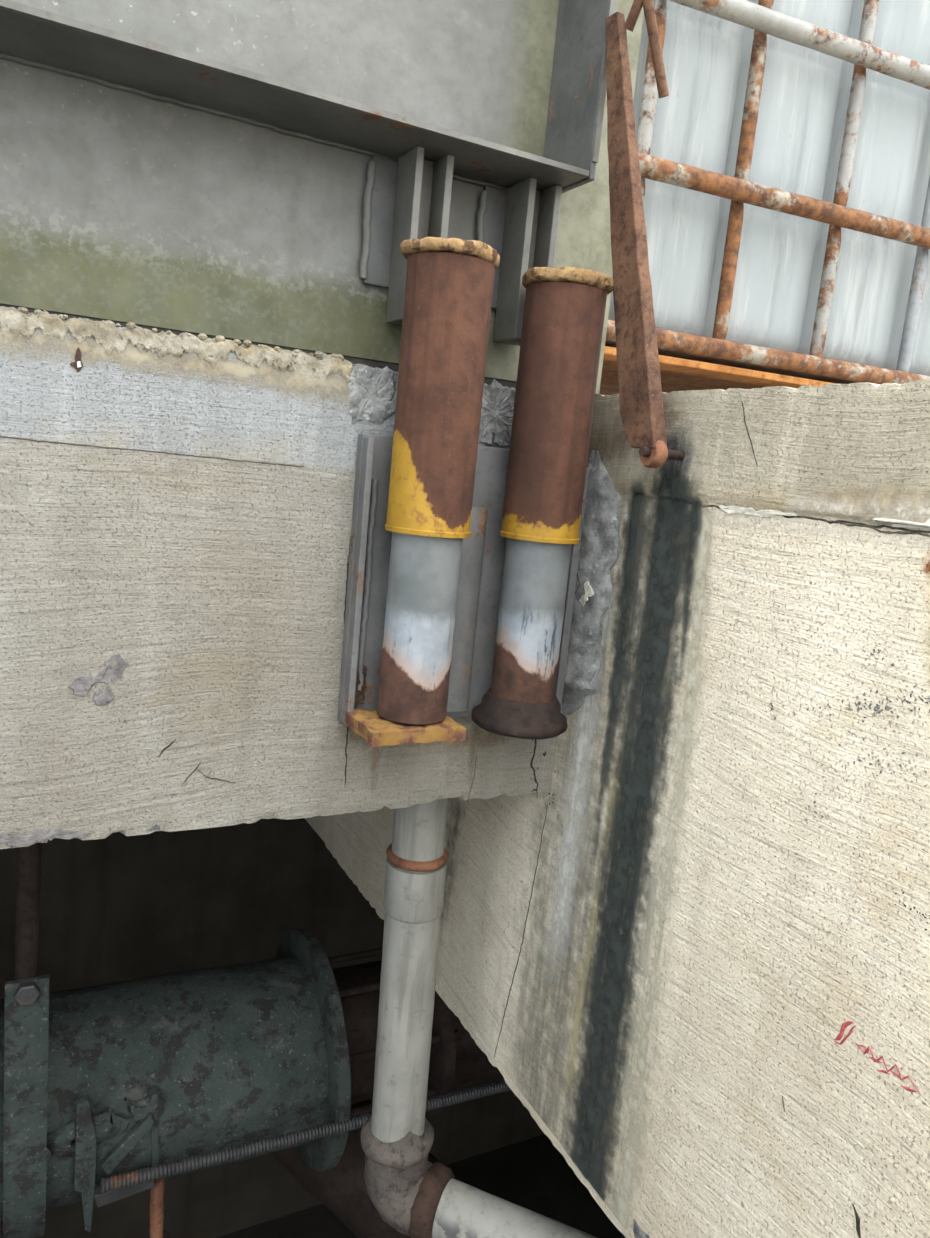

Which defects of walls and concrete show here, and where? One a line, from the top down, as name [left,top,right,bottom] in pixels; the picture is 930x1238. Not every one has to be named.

crack [690,489,930,546]
peeling [68,653,133,705]
crack [181,761,234,787]
damp [522,436,711,1229]
spalling [633,1218,650,1238]